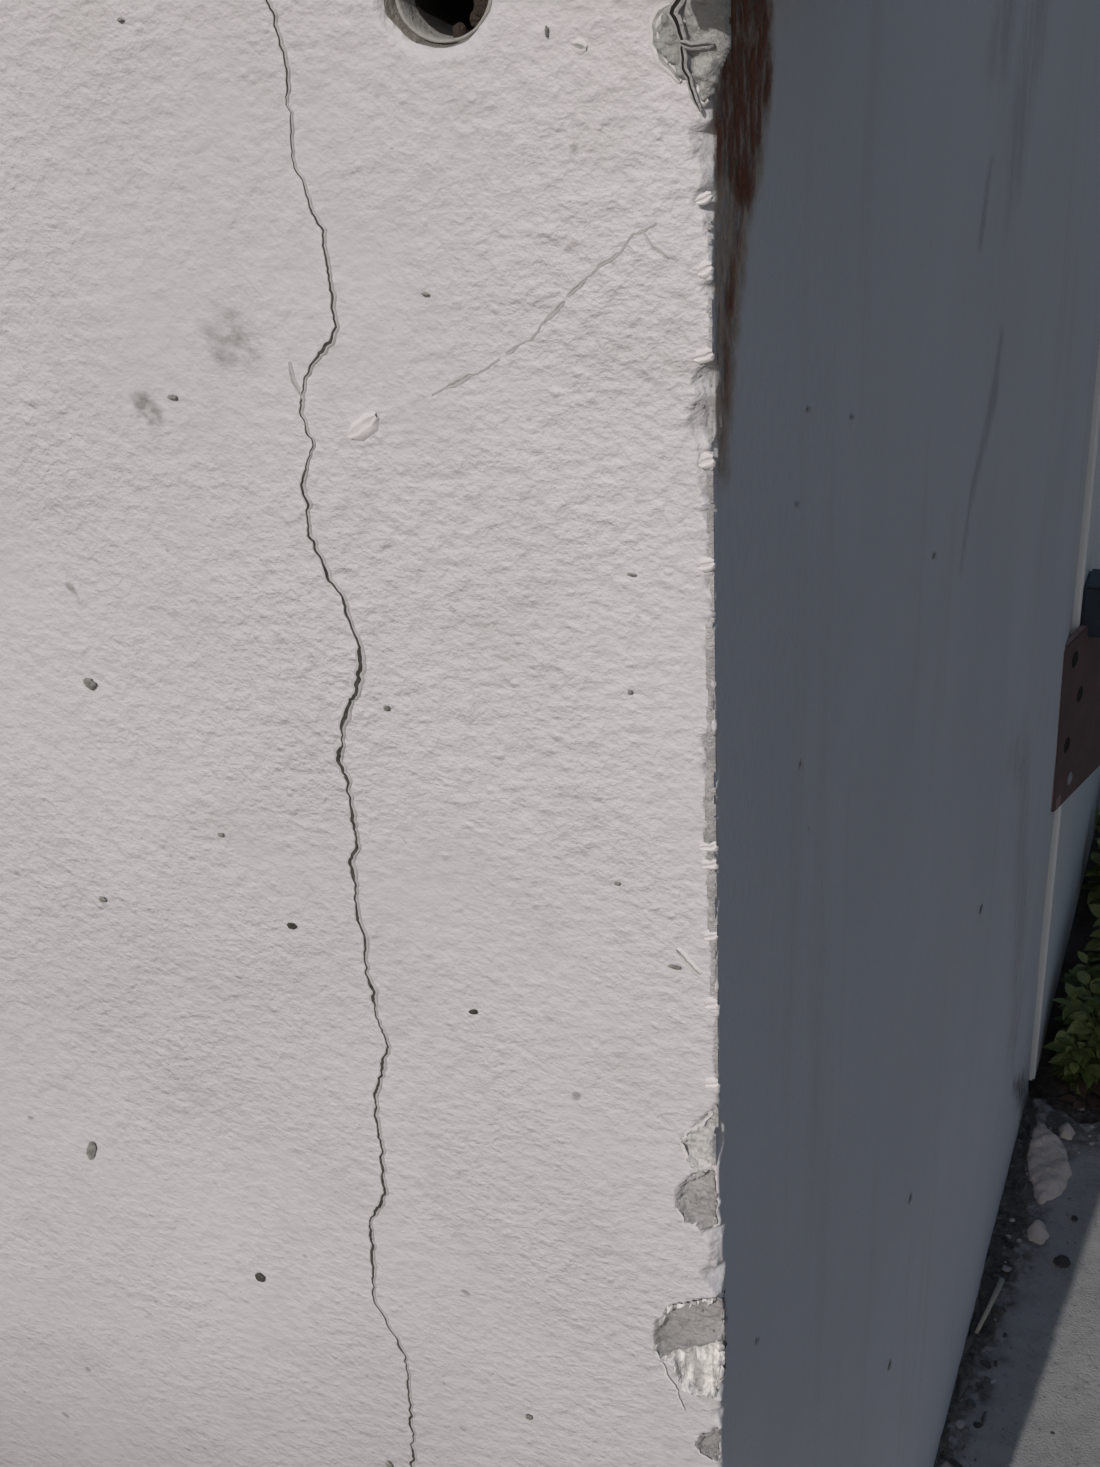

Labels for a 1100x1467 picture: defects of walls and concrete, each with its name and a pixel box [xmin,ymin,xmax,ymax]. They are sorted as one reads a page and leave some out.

flaking render [648,0,688,83]
crack [431,223,670,396]
corrosion [713,0,773,473]
crack [265,0,417,1467]
spalling [652,1291,728,1412]
spalling [695,1428,721,1462]